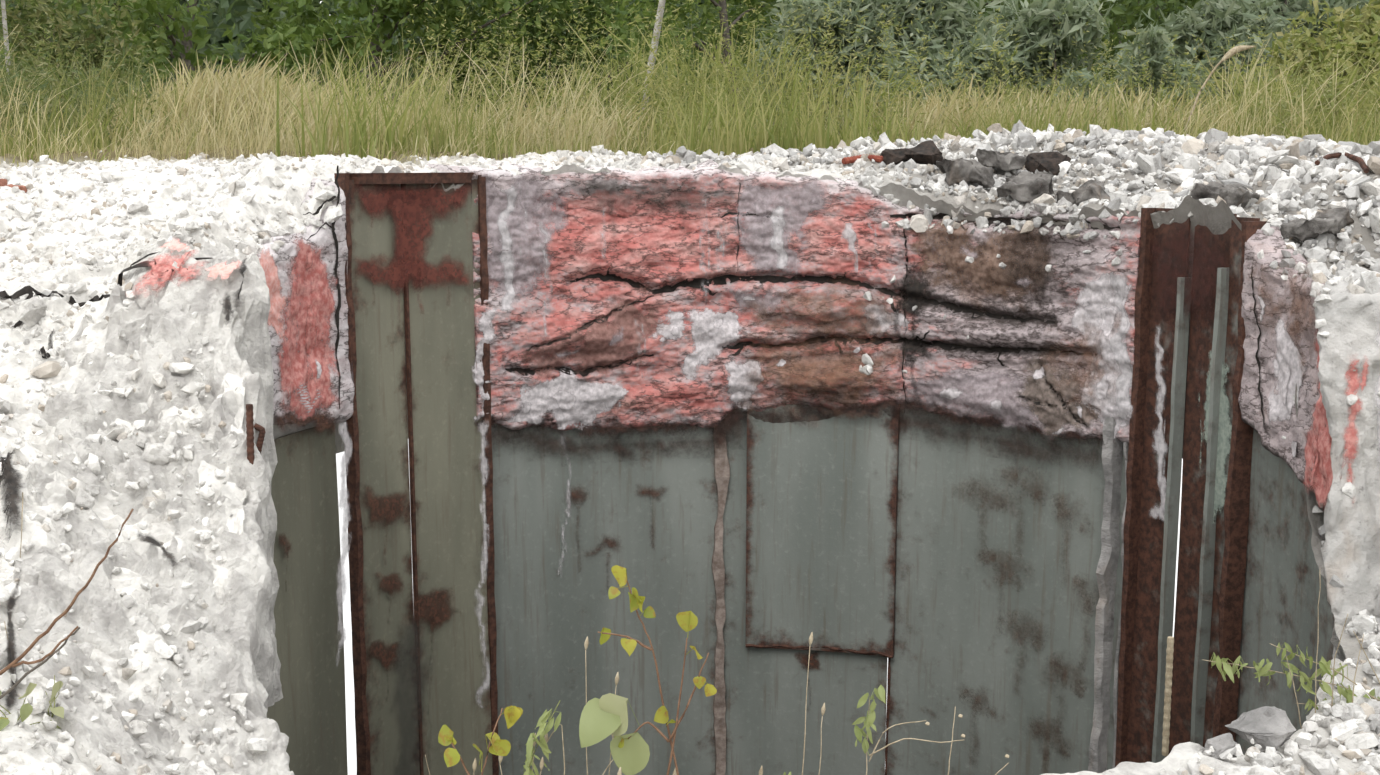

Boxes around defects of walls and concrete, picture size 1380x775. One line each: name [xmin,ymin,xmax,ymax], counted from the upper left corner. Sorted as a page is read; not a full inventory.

peeling [132,238,337,421]
rust [357,187,469,293]
peeling [485,175,566,296]
peeling [731,180,824,275]
crack [505,183,1120,413]
peeling [853,303,909,353]
spalling [911,220,1048,309]
peeling [912,272,1133,439]
rust [1150,229,1225,314]
peeling [1258,296,1369,506]
rust [365,487,409,523]